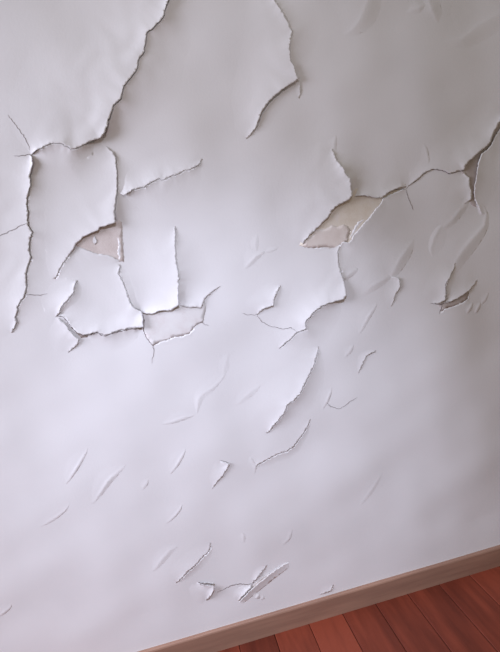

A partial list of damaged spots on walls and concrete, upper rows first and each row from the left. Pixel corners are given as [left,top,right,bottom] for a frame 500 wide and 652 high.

peeling [231,0,321,139]
peeling [0,0,220,353]
peeling [244,100,500,474]
peeling [209,460,230,489]
peeling [171,543,215,604]
peeling [233,562,289,603]